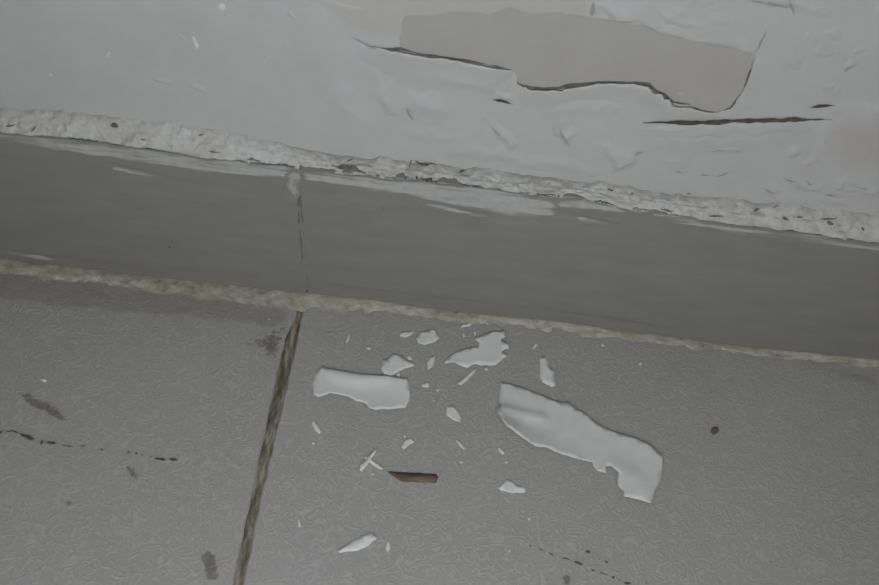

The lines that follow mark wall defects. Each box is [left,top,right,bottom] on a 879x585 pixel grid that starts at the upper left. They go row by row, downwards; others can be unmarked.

leakage [0,133,630,227]
peeling [0,0,879,243]